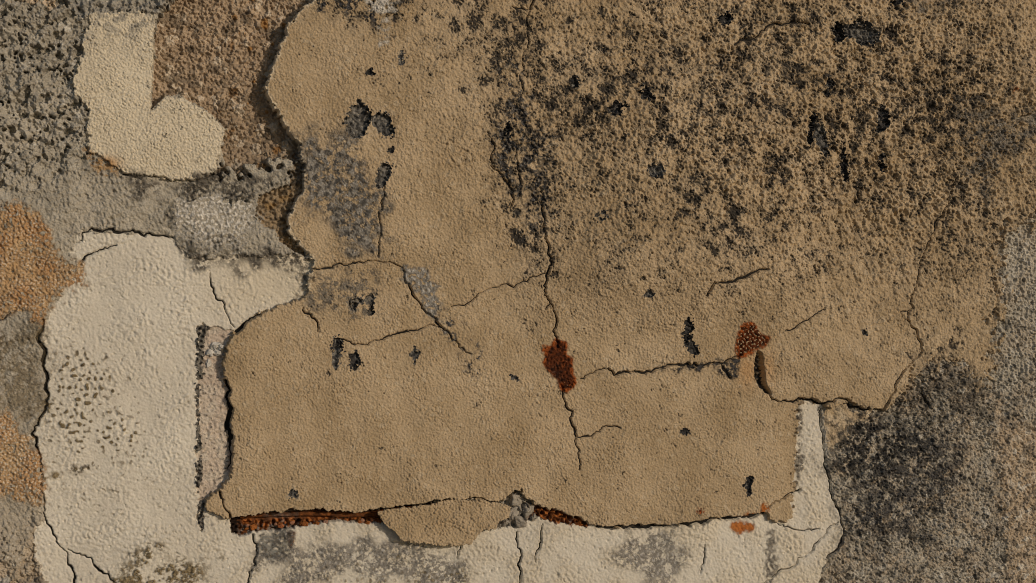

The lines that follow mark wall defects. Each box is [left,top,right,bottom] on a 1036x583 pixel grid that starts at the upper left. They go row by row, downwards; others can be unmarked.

mould [491,59,554,239]
flaking render [805,112,850,182]
crack [302,140,558,354]
peeling [28,0,843,583]
rust [542,339,577,393]
crack [562,356,738,470]
rust [735,322,770,358]
crack [765,178,956,582]
leakage [920,368,989,411]
rust [230,505,412,536]
rust [534,506,588,528]
leakage [834,419,961,537]